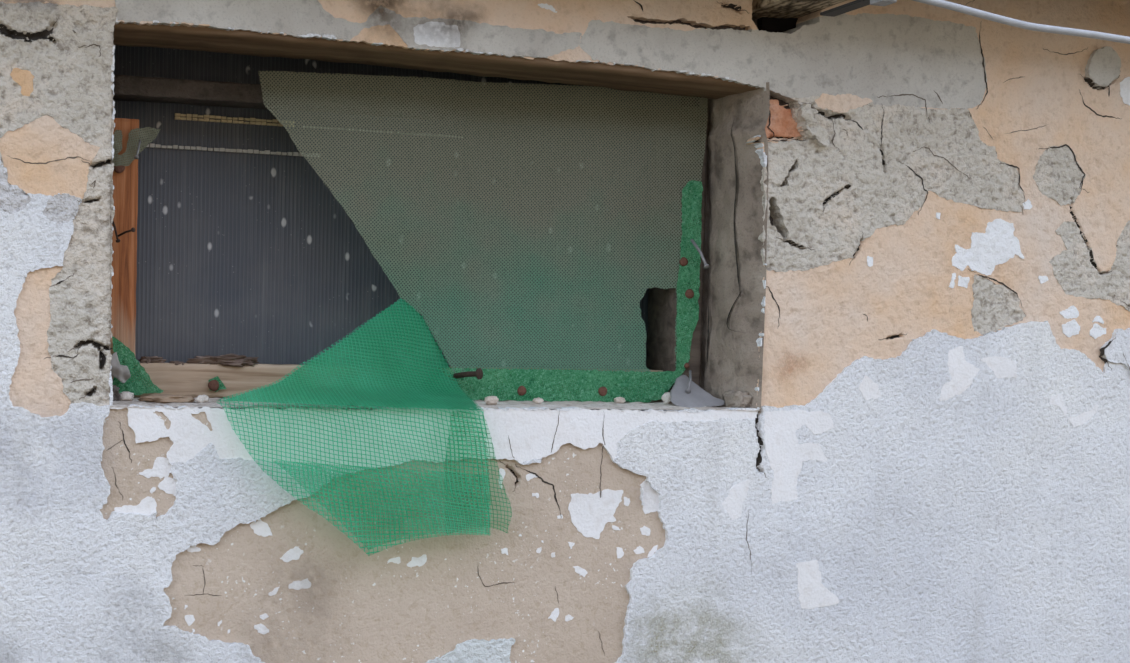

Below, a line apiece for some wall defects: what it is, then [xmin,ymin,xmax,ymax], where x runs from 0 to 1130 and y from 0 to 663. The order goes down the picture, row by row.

crack [721,3,748,13]
peeling [0,0,1130,520]
crack [706,91,969,369]
spalling [163,443,666,663]
crack [755,414,767,478]